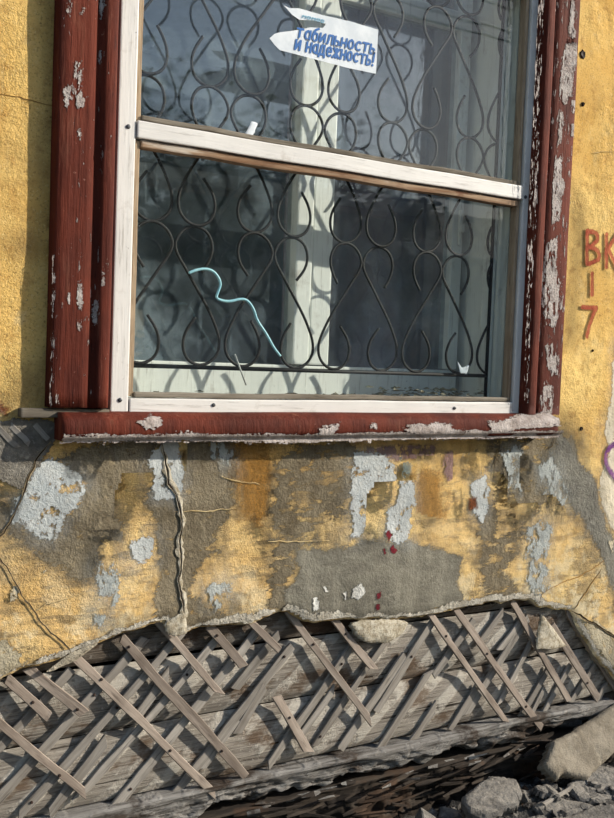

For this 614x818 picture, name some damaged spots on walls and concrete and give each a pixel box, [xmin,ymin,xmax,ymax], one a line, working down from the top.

peeling [63,61,89,109]
peeling [550,0,578,149]
peeling [524,39,542,403]
peeling [0,151,614,678]
crack [0,442,52,537]
crack [0,558,85,653]
crack [160,443,234,617]
crack [542,560,614,636]